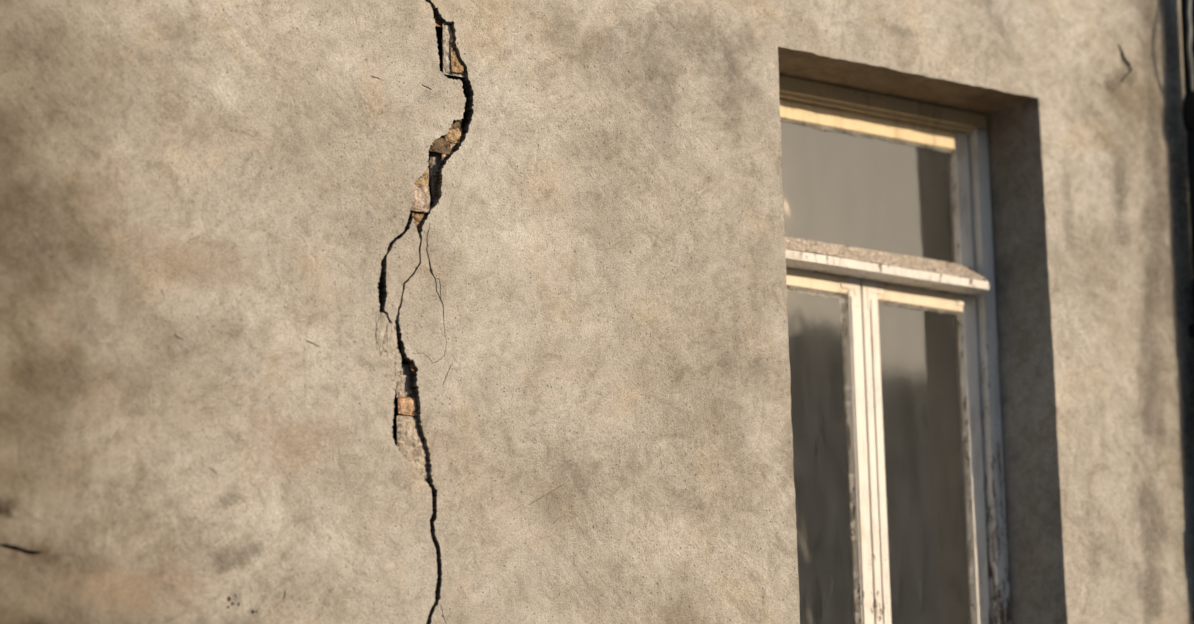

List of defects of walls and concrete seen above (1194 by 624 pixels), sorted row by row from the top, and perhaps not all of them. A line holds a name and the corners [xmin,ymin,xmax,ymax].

crack [375,0,474,624]